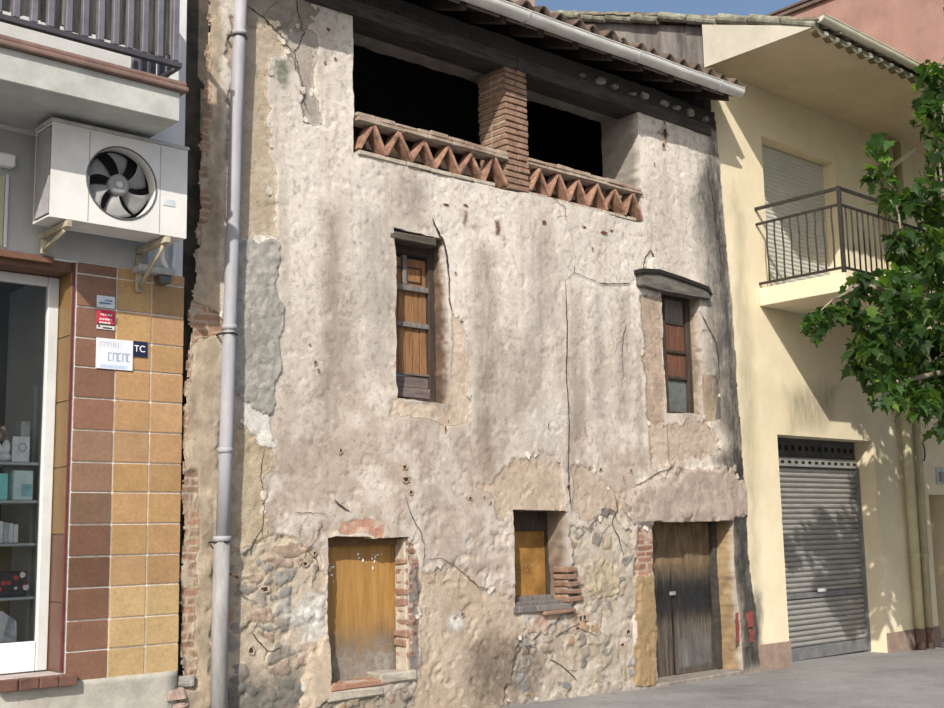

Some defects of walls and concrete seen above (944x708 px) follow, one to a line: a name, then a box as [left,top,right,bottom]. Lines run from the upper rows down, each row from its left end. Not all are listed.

flaking render [194,14,213,257]
crack [249,2,310,114]
peeling [239,0,337,244]
crack [565,250,654,504]
peeling [640,294,721,468]
leakage [702,138,745,484]
flaking render [167,302,223,708]
crack [406,499,488,589]
peeling [406,543,526,708]
peeling [468,448,710,577]
crack [600,428,675,555]
leakage [733,514,760,665]